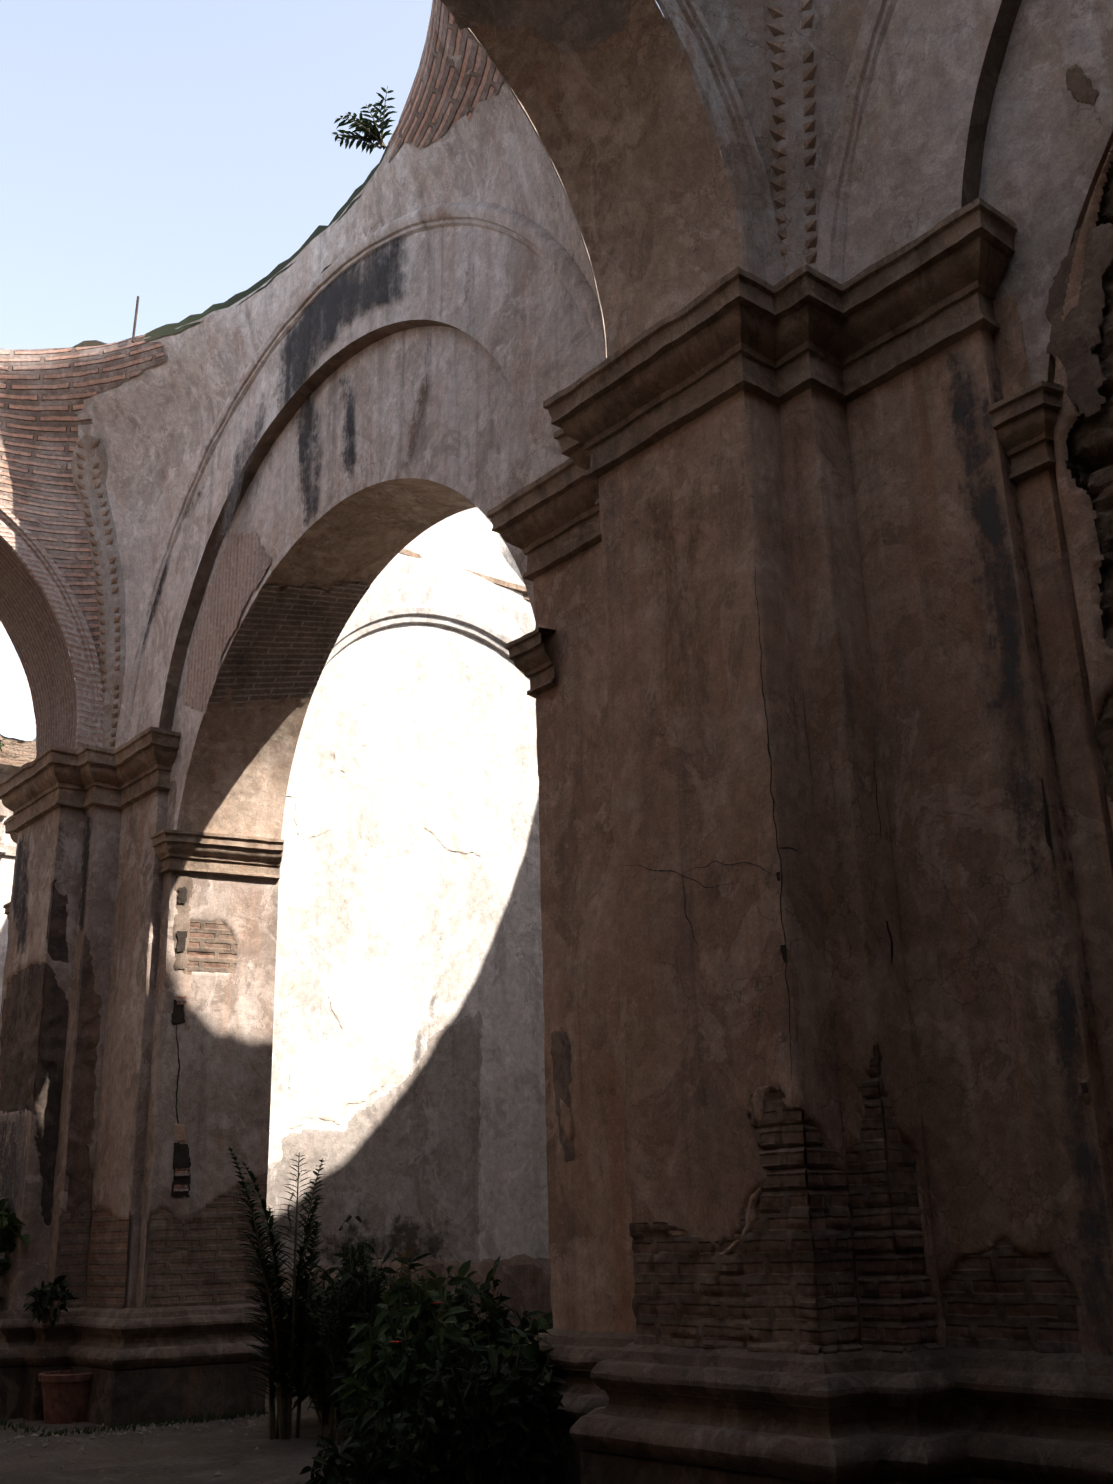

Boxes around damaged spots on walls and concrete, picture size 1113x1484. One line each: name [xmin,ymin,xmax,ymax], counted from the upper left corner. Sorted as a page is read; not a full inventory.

leakage [221,234,405,536]
leakage [947,355,1073,933]
flaking render [0,879,130,1309]
crack [173,1024,181,1124]
spalling [171,996,187,1025]
flaking render [172,871,238,975]
flaking render [145,1105,303,1308]
crack [625,569,797,1072]
flaking render [629,1085,863,1355]
crack [885,921,893,964]
leakage [1050,956,1113,1356]